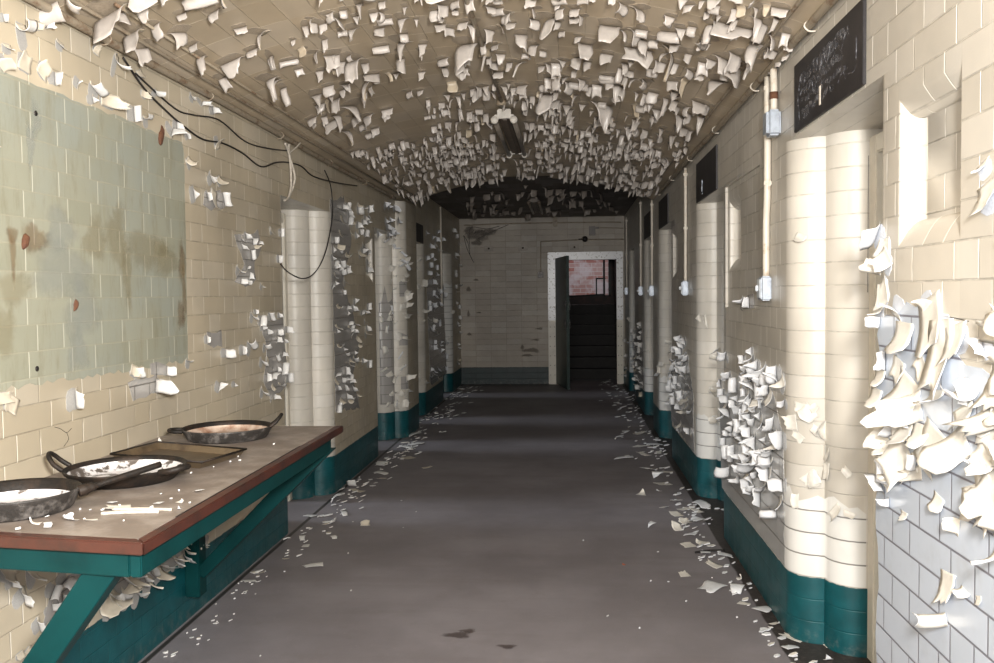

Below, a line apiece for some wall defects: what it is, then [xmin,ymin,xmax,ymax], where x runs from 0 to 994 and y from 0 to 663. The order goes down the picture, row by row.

peeling [0,0,793,416]
peeling [0,569,81,661]
peeling [99,534,210,622]
peeling [622,222,994,663]